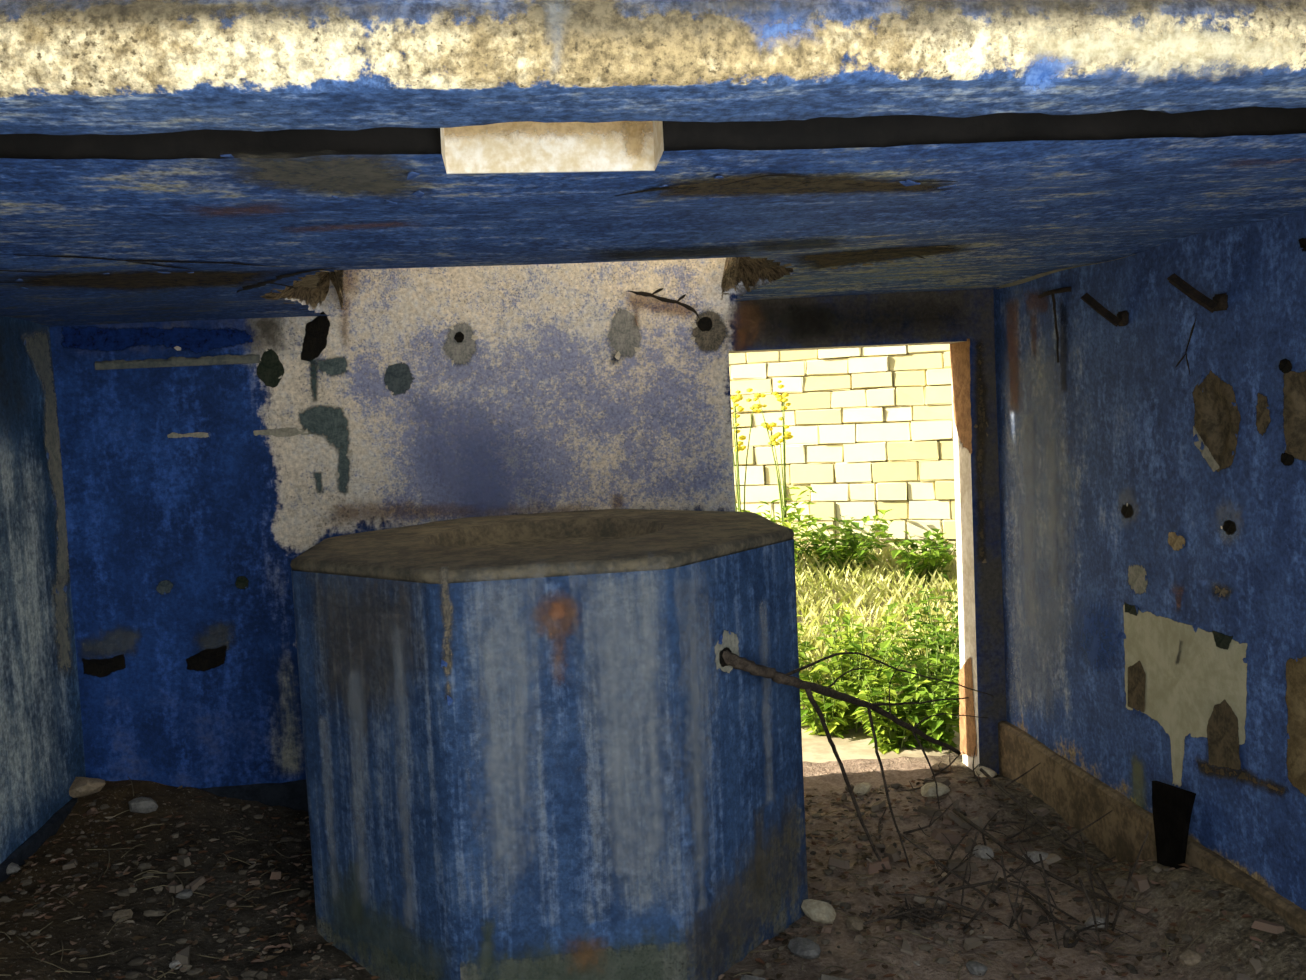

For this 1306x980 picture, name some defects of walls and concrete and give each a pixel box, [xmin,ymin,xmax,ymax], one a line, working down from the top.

peeling [15,270,353,493]
peeling [384,362,415,395]
spalling [443,323,478,366]
spalling [607,309,641,362]
spalling [690,245,964,352]
spalling [1192,359,1306,472]
peeling [24,325,284,678]
peeling [1117,565,1306,797]